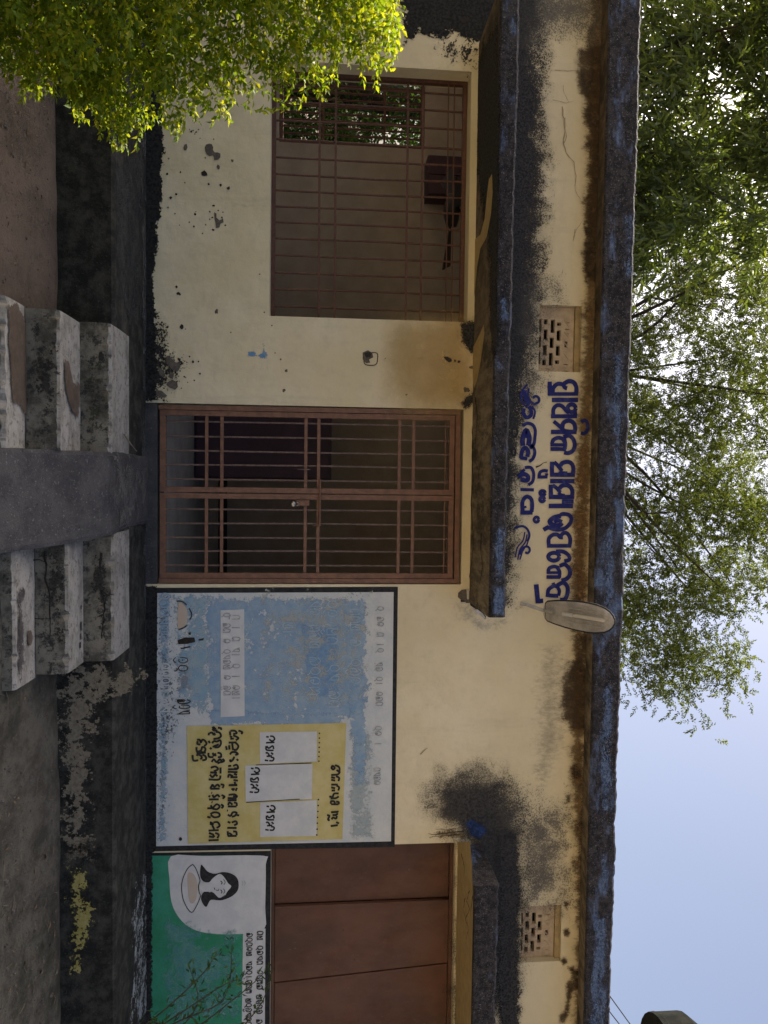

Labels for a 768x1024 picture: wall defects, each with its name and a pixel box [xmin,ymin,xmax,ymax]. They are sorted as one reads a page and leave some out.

water stain [146,3,167,402]
peeling [189,129,234,190]
crack [555,70,580,198]
water stain [398,0,602,615]
water stain [34,342,61,408]
water stain [560,634,587,729]
water stain [419,762,583,1024]